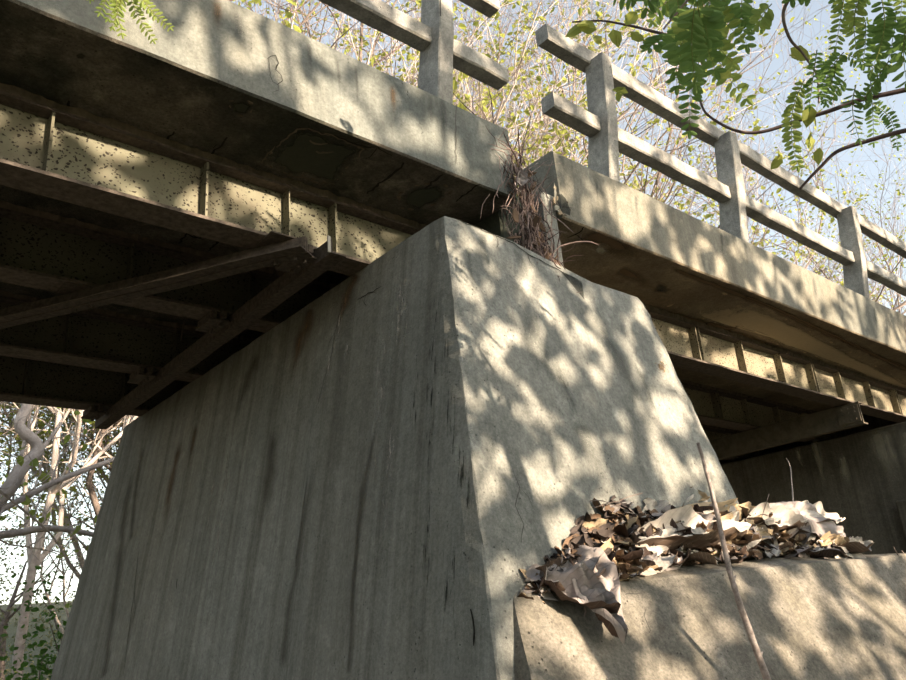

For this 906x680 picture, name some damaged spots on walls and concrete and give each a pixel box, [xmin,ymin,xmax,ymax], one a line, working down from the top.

damp [348,446,372,668]